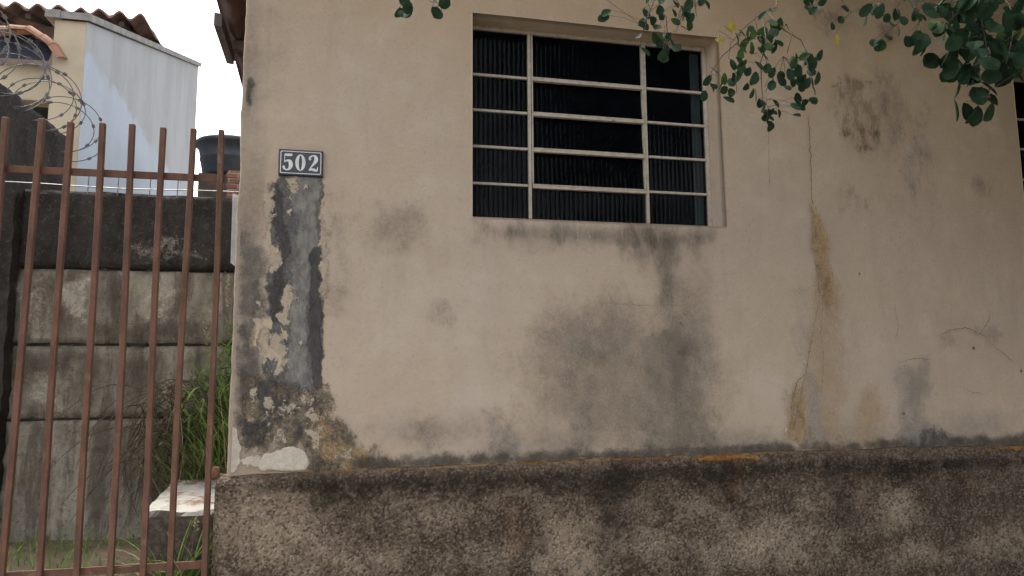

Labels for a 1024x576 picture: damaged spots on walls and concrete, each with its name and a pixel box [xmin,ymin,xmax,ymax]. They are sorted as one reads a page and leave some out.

peeling [231,176,387,473]
crack [784,114,842,444]